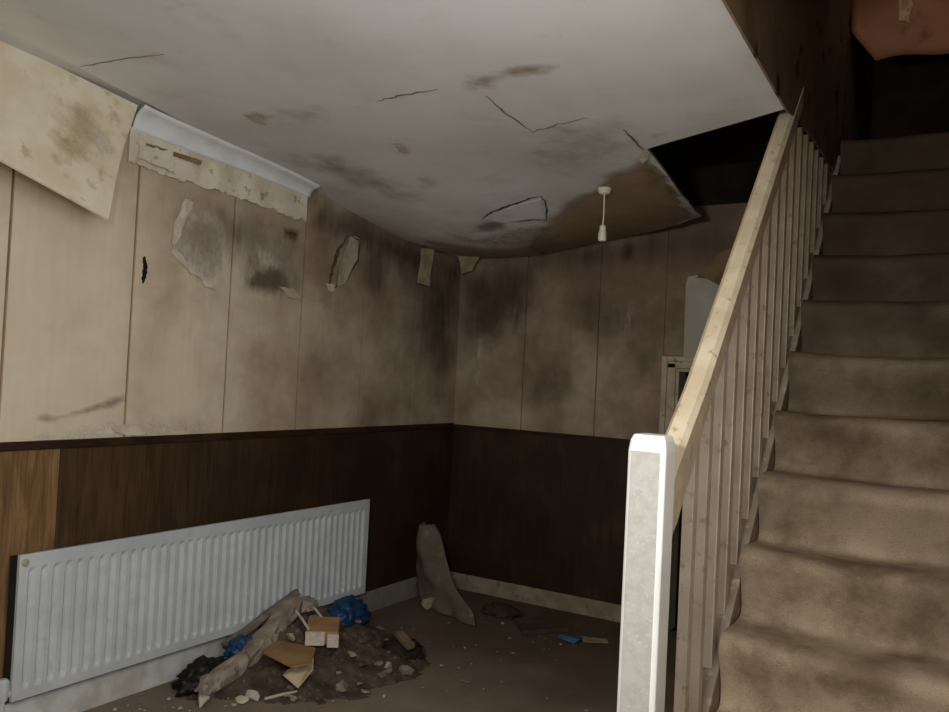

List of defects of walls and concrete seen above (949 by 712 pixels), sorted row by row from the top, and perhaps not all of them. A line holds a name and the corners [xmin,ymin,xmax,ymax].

crack [80,54,164,67]
crack [379,89,438,101]
crack [486,96,588,133]
peeling [146,143,202,165]
peeling [170,196,226,290]
damp [249,227,301,299]